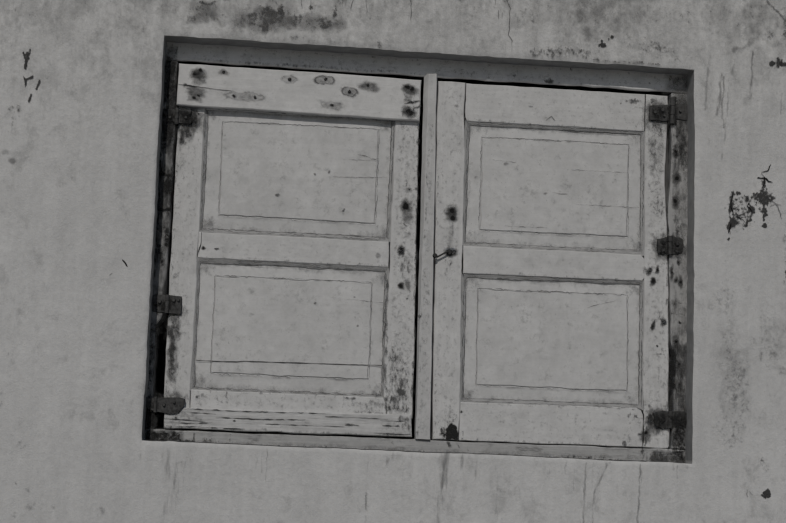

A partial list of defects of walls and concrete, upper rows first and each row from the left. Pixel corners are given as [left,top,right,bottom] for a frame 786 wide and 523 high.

leakage [244,6,284,31]
spalling [727,165,775,240]